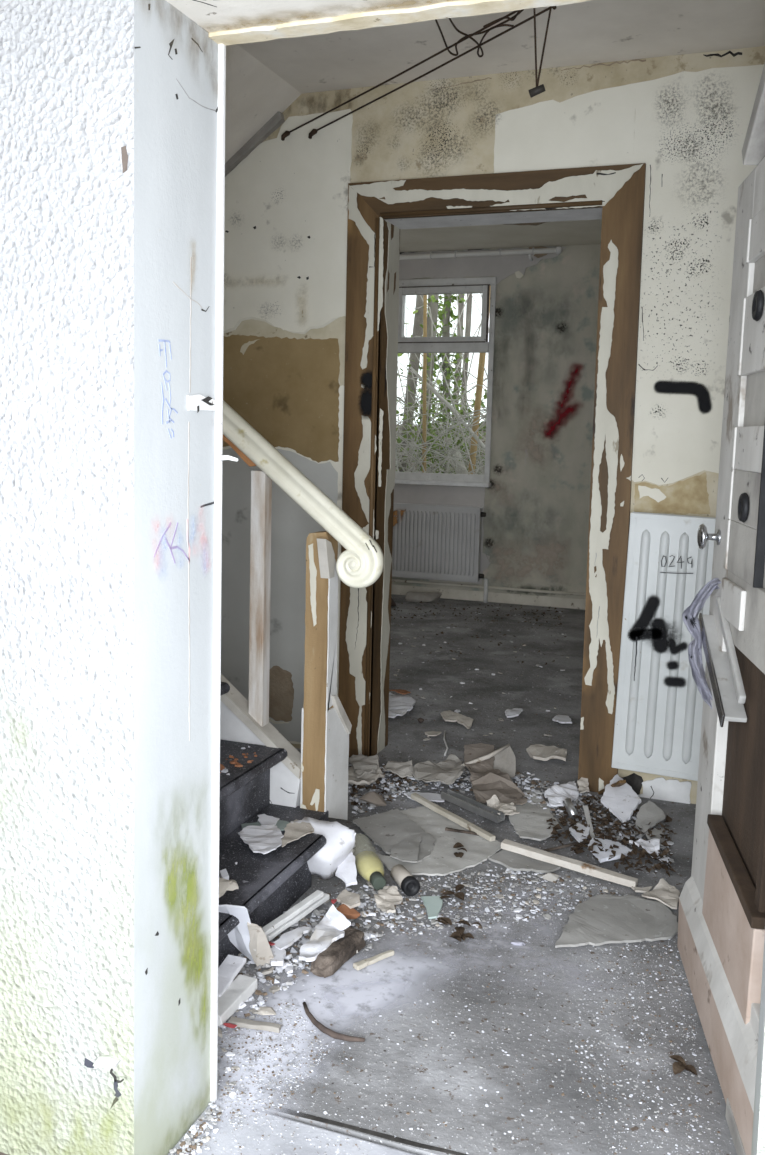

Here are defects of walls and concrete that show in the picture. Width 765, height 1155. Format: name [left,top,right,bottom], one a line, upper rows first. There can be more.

water stain [664,116,732,159]
peeling [223,316,346,463]
peeling [346,164,643,754]
peeling [584,240,710,714]
peeling [308,544,317,626]
spalling [269,665,294,724]
peeling [301,789,320,811]
water stain [167,858,206,1021]
crack [84,1055,124,1109]